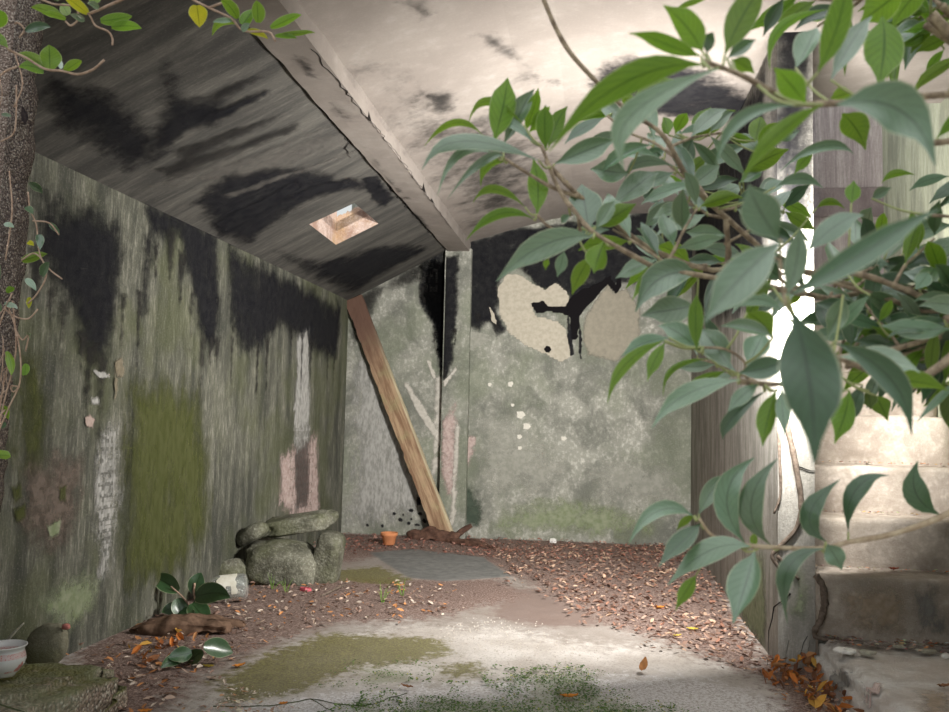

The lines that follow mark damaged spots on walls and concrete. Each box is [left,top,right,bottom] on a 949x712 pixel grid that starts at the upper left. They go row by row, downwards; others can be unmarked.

water stain [201,81,267,125]
water stain [160,121,296,176]
crack [311,49,452,239]
water stain [30,248,66,326]
water stain [155,234,194,313]
peeling [489,274,571,362]
peeling [584,286,640,361]
water stain [79,334,107,403]
water stain [291,328,313,511]
water stain [21,450,81,550]
water stain [95,429,123,575]